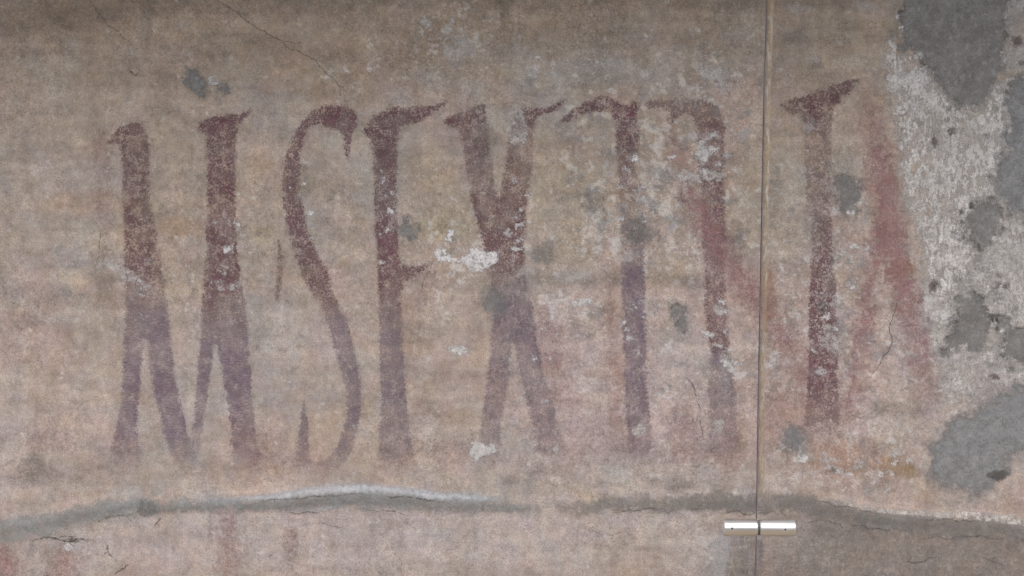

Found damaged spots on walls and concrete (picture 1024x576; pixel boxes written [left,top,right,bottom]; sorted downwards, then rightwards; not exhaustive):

flaking render [434,229,498,272]
peeling [881,0,1024,495]